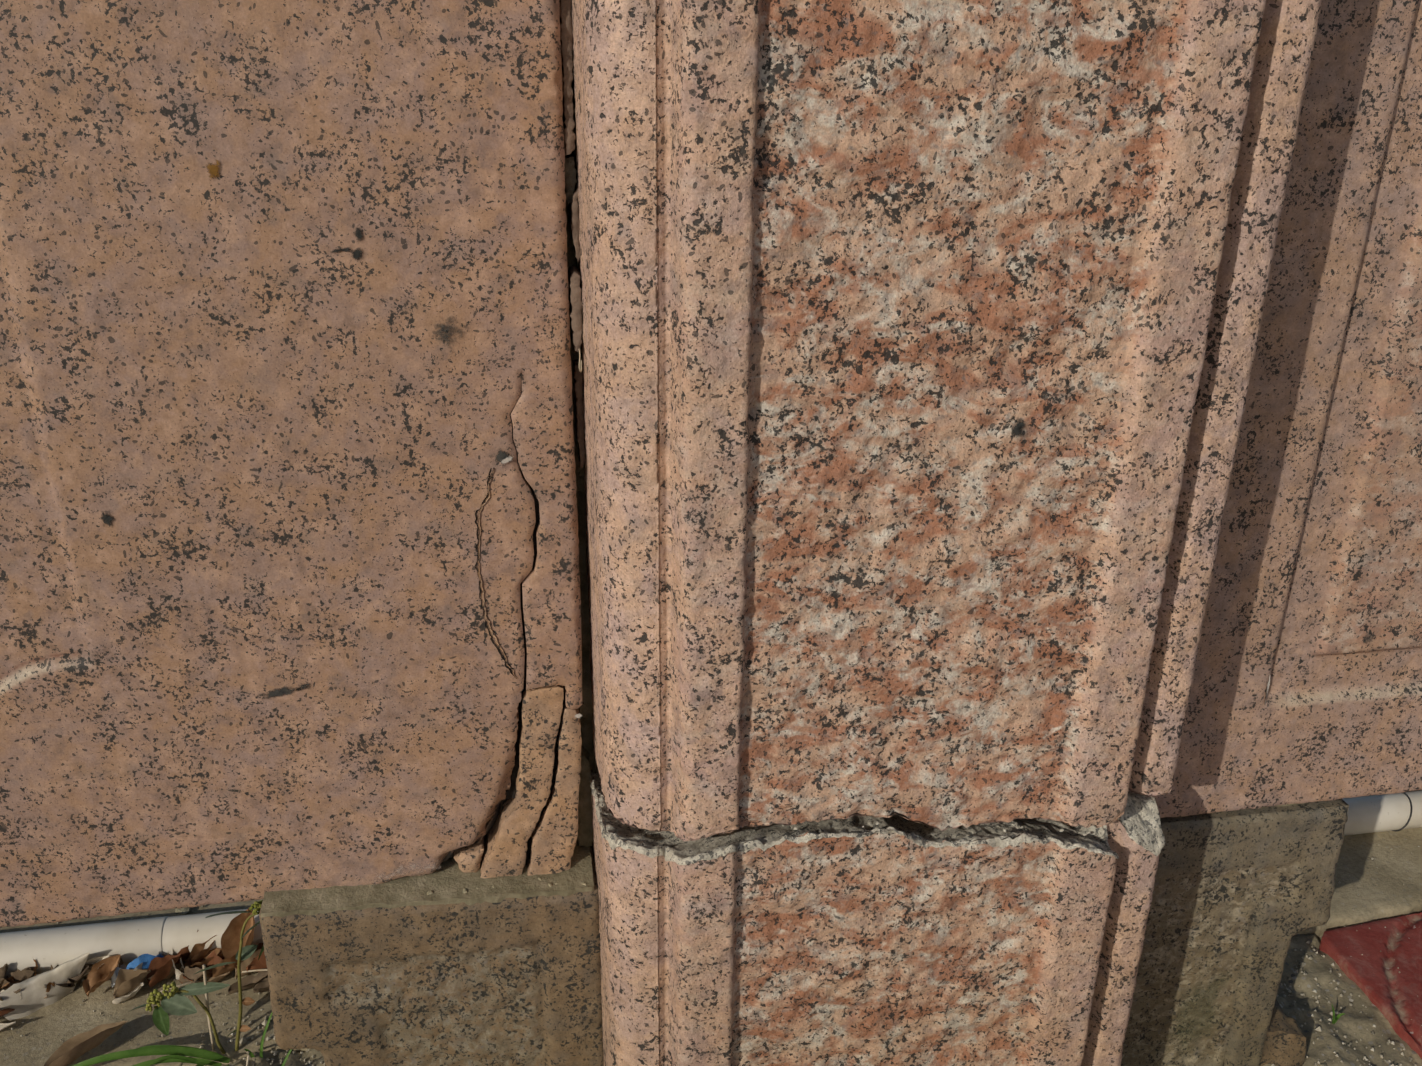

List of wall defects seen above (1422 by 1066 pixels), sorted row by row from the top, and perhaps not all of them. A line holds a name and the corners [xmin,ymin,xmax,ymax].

crack [443,380,1165,878]